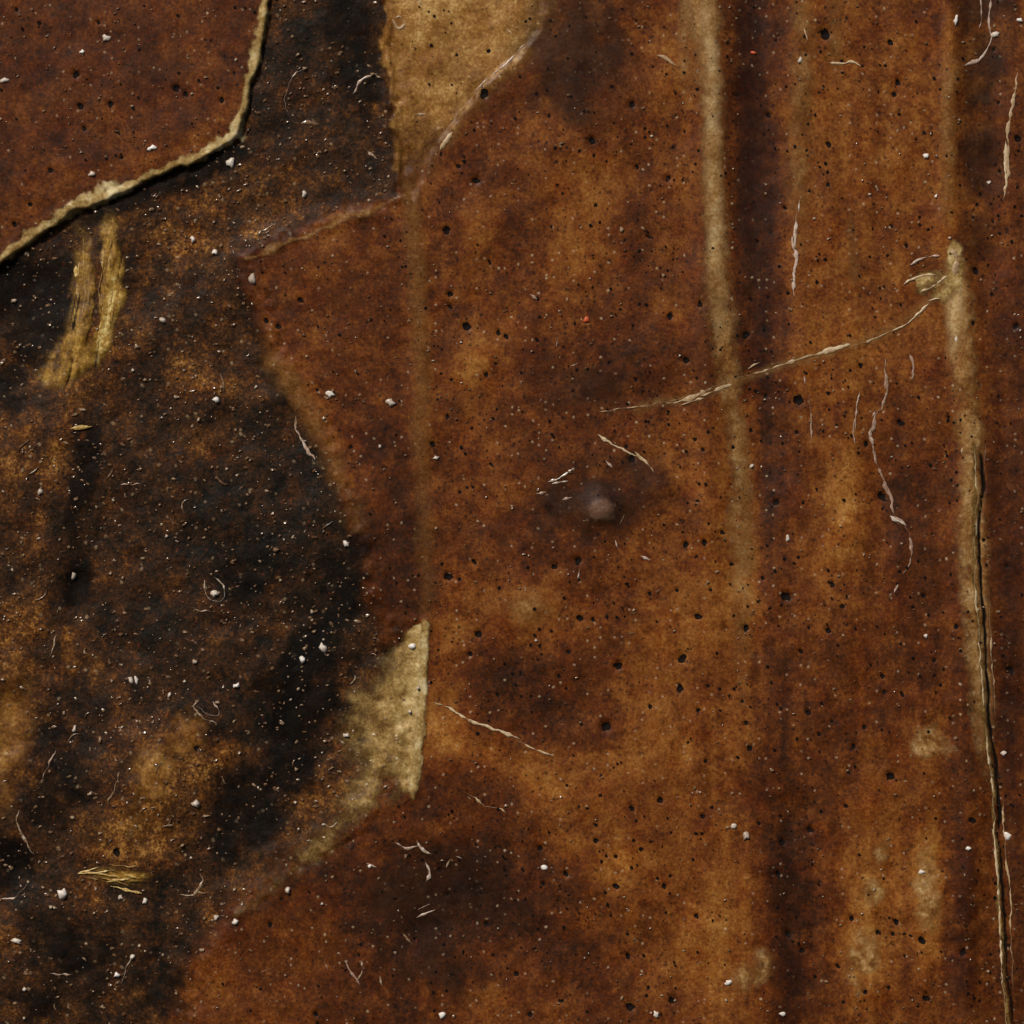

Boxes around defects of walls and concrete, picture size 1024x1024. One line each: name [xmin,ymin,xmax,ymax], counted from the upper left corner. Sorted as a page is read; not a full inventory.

spalling [0,0,548,1024]
leakage [683,0,748,569]
crack [853,354,914,592]
leakage [944,257,989,725]
crack [972,442,1014,1024]